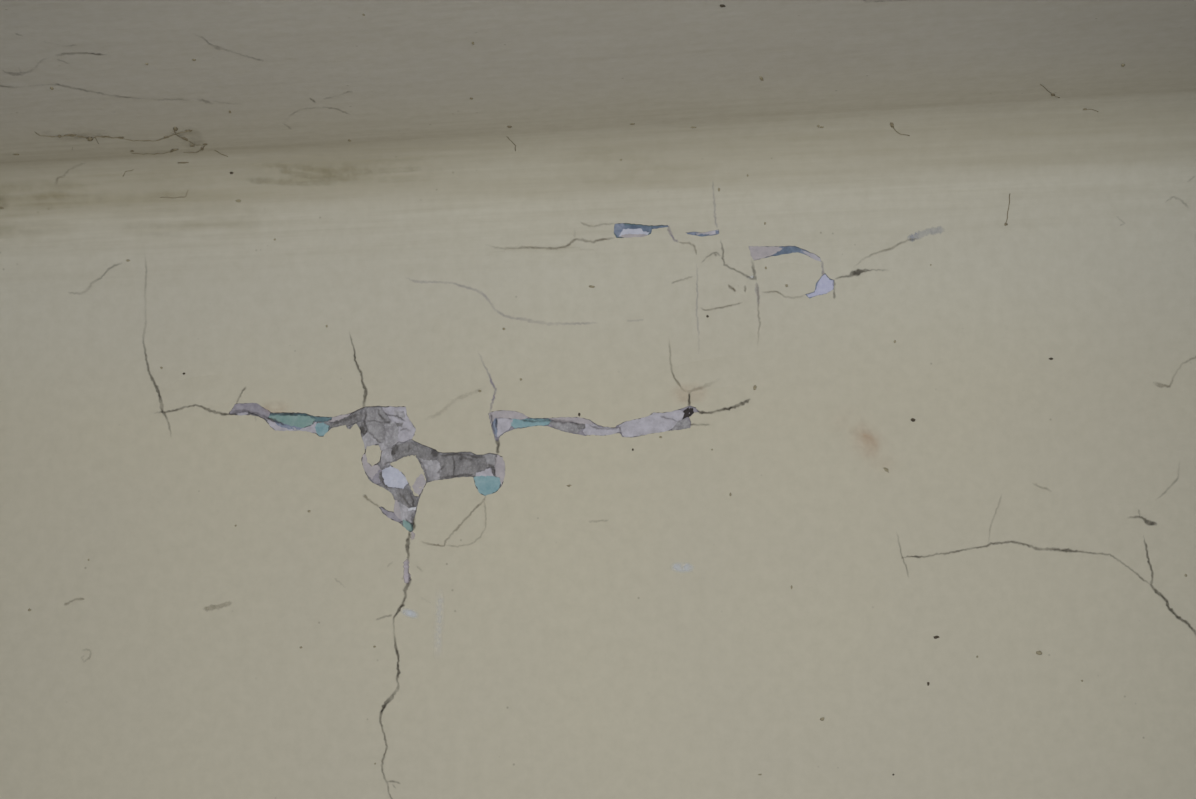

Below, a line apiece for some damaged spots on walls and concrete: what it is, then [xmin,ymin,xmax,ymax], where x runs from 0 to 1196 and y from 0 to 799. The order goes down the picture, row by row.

peeling [614,223,669,238]
peeling [686,229,719,237]
peeling [749,246,834,299]
spalling [229,403,699,532]
crack [395,532,415,616]